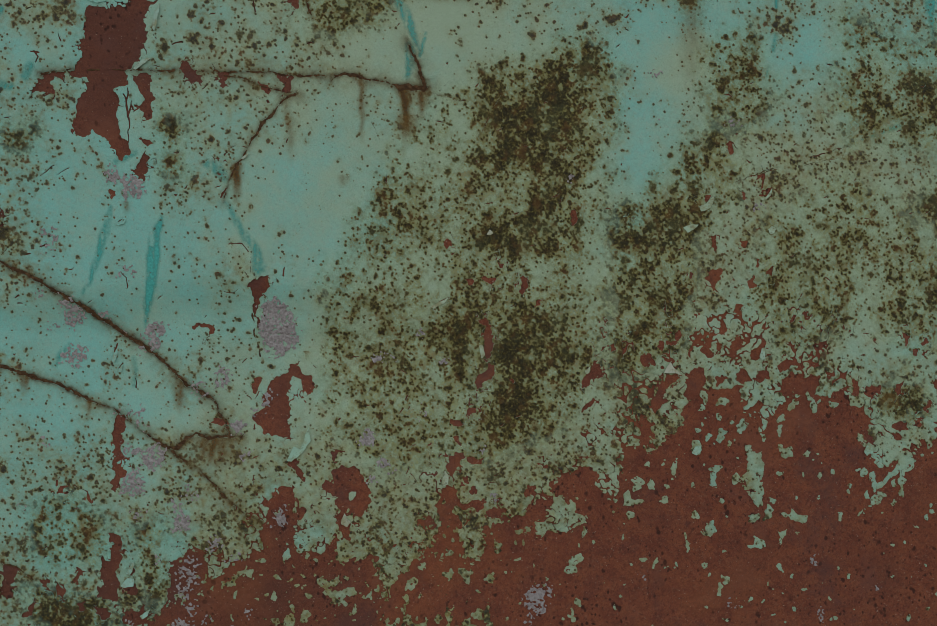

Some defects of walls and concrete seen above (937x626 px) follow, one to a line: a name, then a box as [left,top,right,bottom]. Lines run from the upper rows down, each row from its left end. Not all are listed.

peeling [31,0,160,181]
rust [825,0,937,155]
rust [314,22,786,477]
peeling [747,258,773,289]
rust [733,174,937,364]
peeling [77,304,937,626]
rust [870,374,934,429]
peeling [0,563,20,599]
peeling [40,567,85,600]